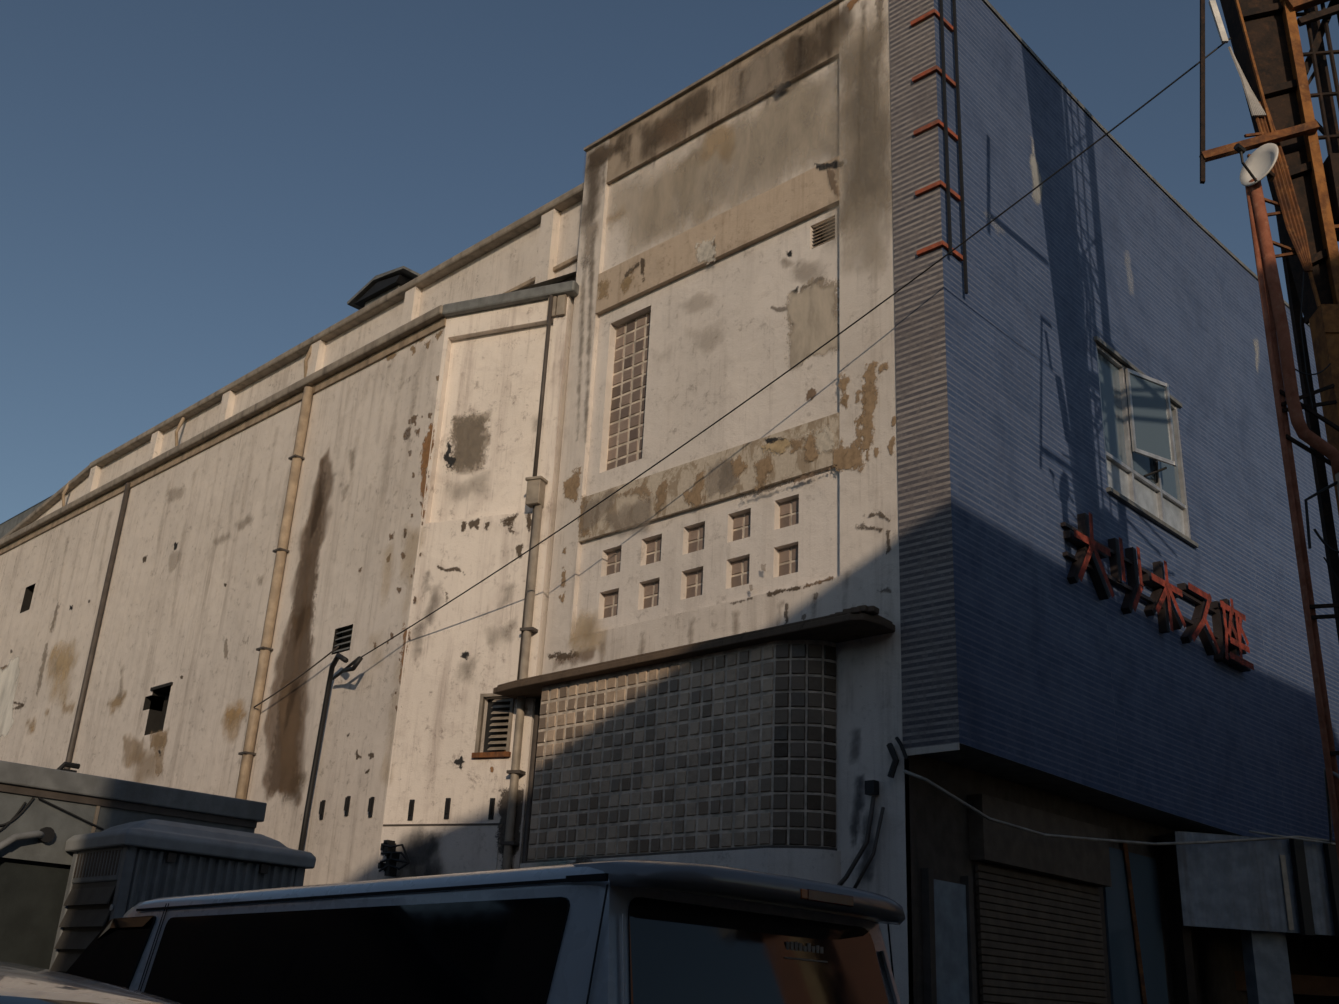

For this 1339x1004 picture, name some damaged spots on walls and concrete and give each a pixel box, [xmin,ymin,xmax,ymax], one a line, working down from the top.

water stain [642,89,708,156]
water stain [734,6,892,224]
water stain [583,138,622,262]
peeling [559,362,896,602]
water stain [150,731,167,754]
water stain [402,833,439,877]